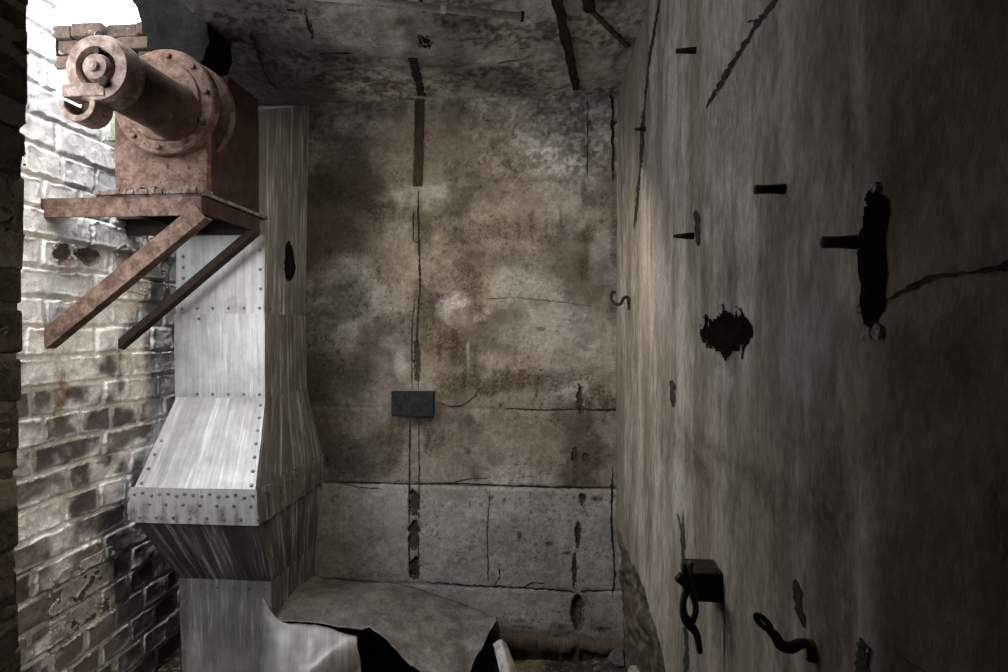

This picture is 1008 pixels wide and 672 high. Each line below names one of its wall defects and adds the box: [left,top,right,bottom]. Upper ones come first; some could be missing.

crack [885,260,1008,301]
spalling [412,341,421,381]
spalling [700,304,752,361]
spalling [575,384,585,414]
spalling [406,488,422,580]
spalling [559,522,604,631]